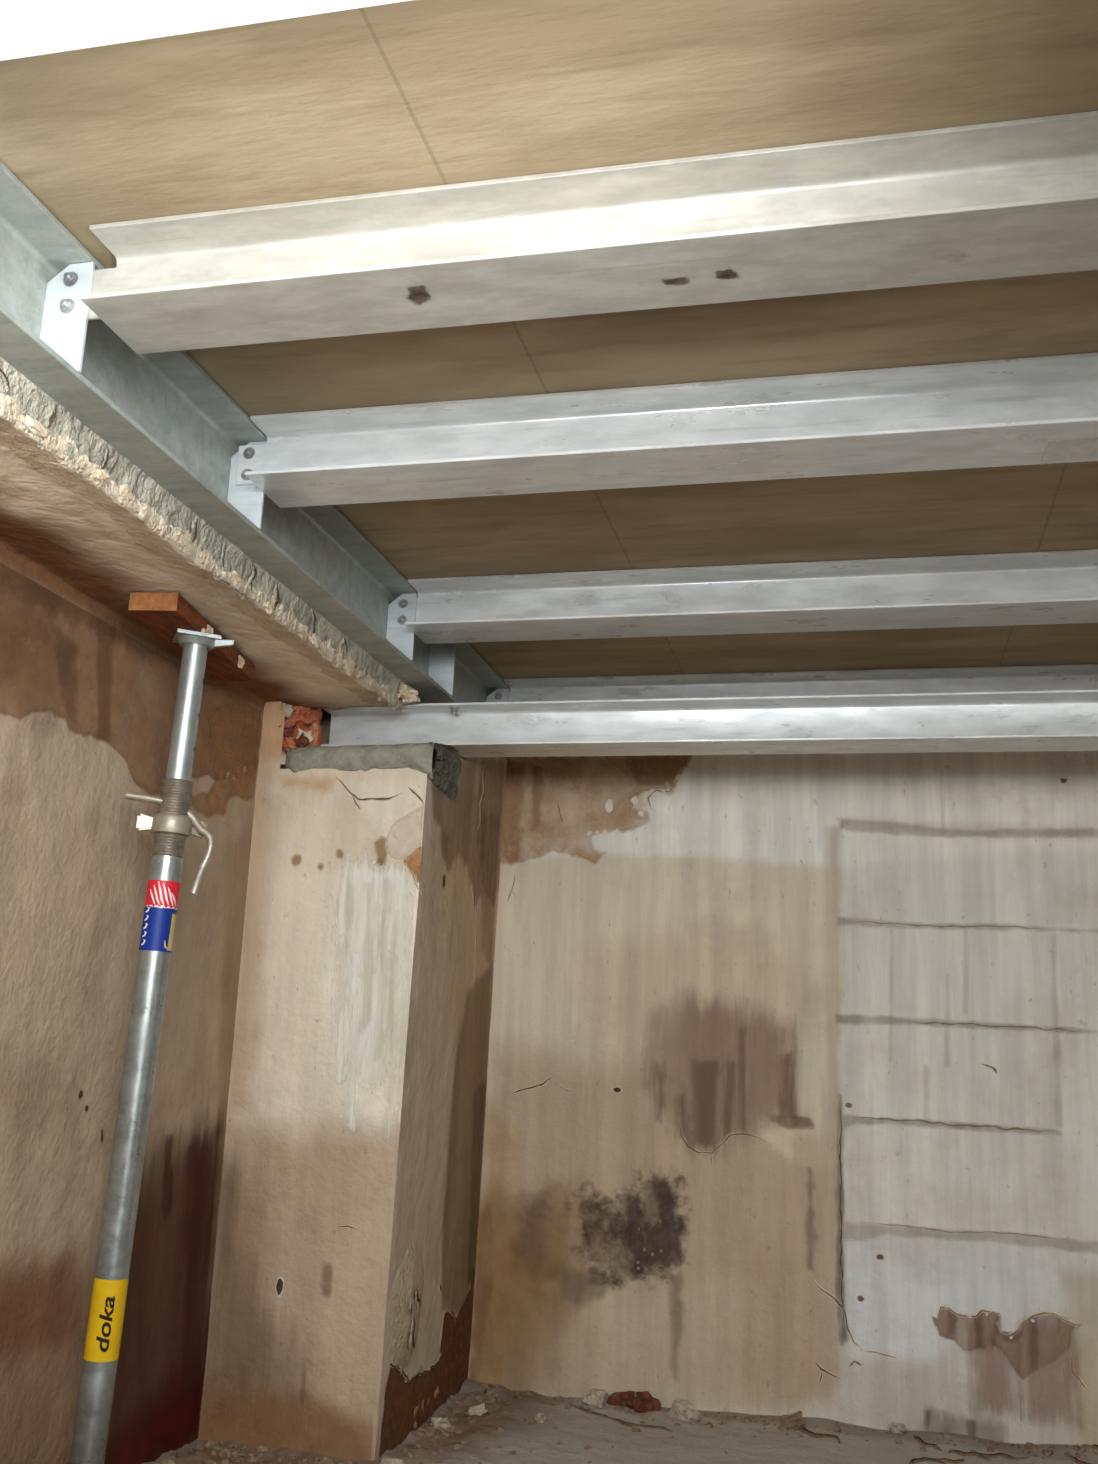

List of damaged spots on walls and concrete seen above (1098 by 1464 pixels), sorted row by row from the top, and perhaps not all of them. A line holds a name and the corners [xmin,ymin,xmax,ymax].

spalling [0,393,421,751]
peeling [502,755,687,863]
damp [687,1007,782,1143]
damp [793,1118,810,1126]
damp [108,1141,213,1464]
spalling [379,1270,475,1464]
spalling [468,1403,488,1416]